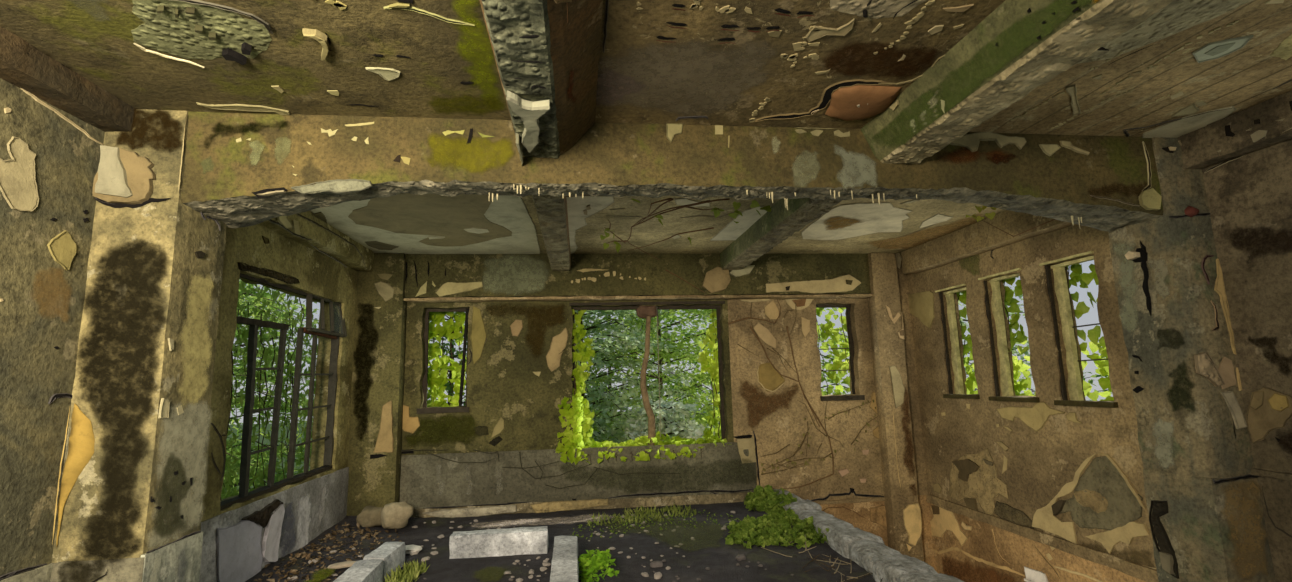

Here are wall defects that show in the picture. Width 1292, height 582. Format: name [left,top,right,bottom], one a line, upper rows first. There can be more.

flaking render [131,0,273,68]
peeling [0,136,39,212]
peeling [251,165,540,254]
crack [1090,118,1182,206]
crack [1169,206,1211,218]
crack [1125,241,1151,316]
crack [1201,255,1214,285]
damp [59,240,213,582]
mould [353,304,378,441]
crack [811,405,901,520]
flaking render [903,402,1179,582]
peeling [216,499,285,582]